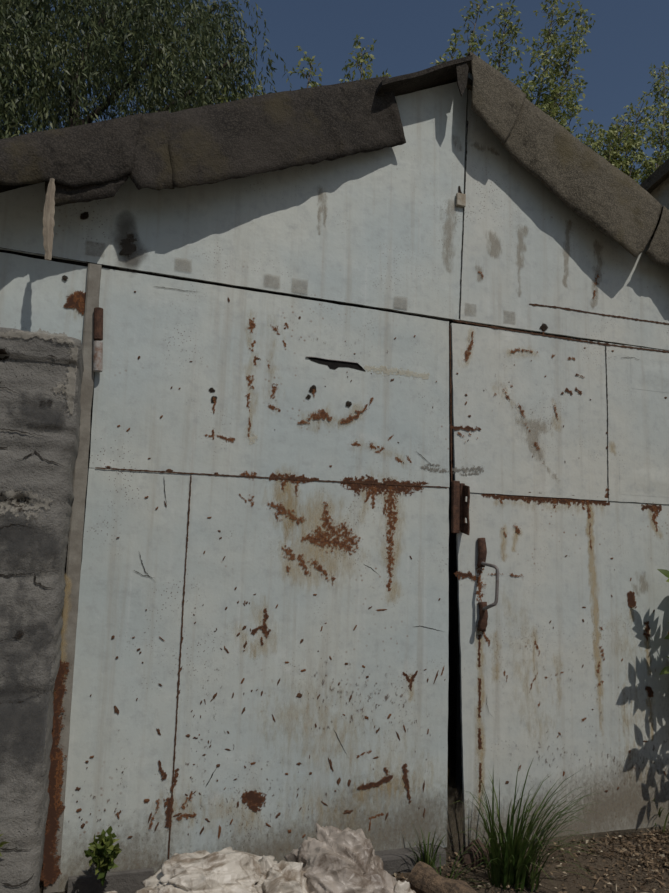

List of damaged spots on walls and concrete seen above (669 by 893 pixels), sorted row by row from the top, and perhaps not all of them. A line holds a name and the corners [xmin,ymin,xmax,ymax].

crack [0,428,67,468]
rust [54,207,669,859]
rust [40,659,70,887]